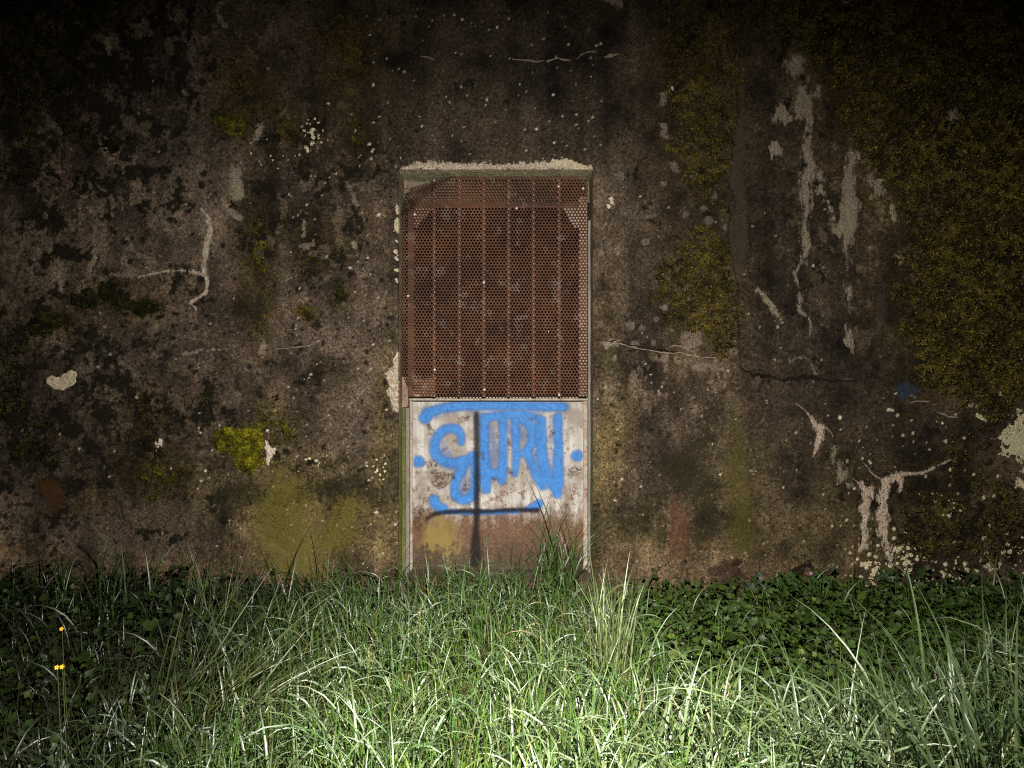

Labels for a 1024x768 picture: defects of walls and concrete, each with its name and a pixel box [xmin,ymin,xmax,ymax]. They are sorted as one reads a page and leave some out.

leakage [768,141,783,160]
leakage [771,54,888,313]
crack [138,208,213,311]
leakage [755,287,783,320]
flaking render [46,370,77,391]
crack [597,265,856,457]
leakage [843,326,854,354]
leakage [829,444,854,488]